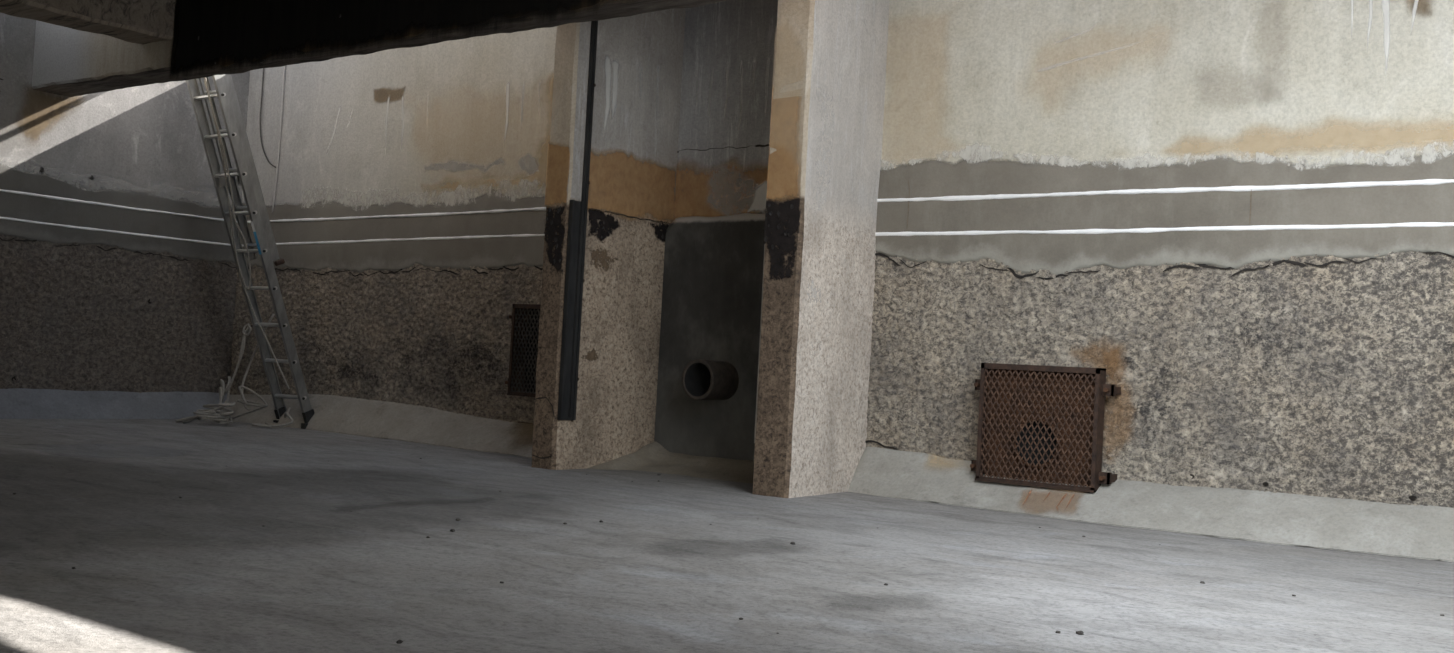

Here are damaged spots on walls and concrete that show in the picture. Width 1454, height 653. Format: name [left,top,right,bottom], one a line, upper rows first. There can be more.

water stain [1411,0,1428,26]
water stain [1351,0,1389,66]
water stain [880,142,1454,170]